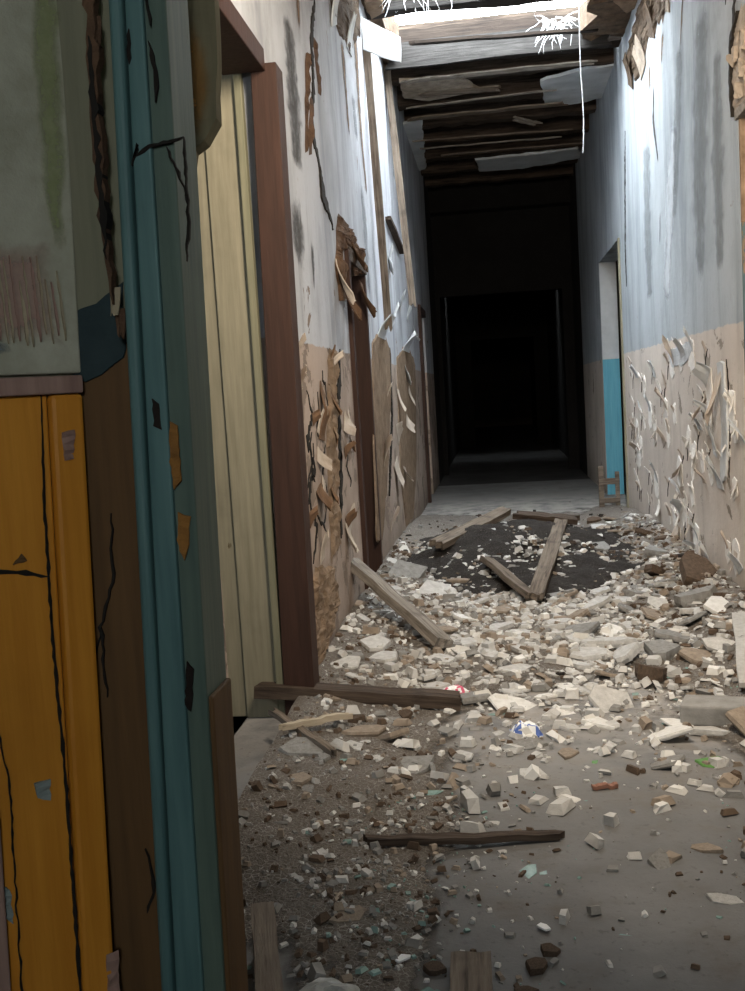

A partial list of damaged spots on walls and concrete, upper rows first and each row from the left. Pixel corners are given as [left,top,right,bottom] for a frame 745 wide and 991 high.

crack [305,0,334,230]
flaking render [622,0,683,89]
crack [725,0,736,23]
flaking render [726,2,745,117]
crack [40,395,82,991]
crack [96,513,116,697]
peeling [301,344,359,665]
peeling [335,242,420,542]
peeling [628,325,745,560]
peeling [720,530,743,577]
crack [144,848,156,913]